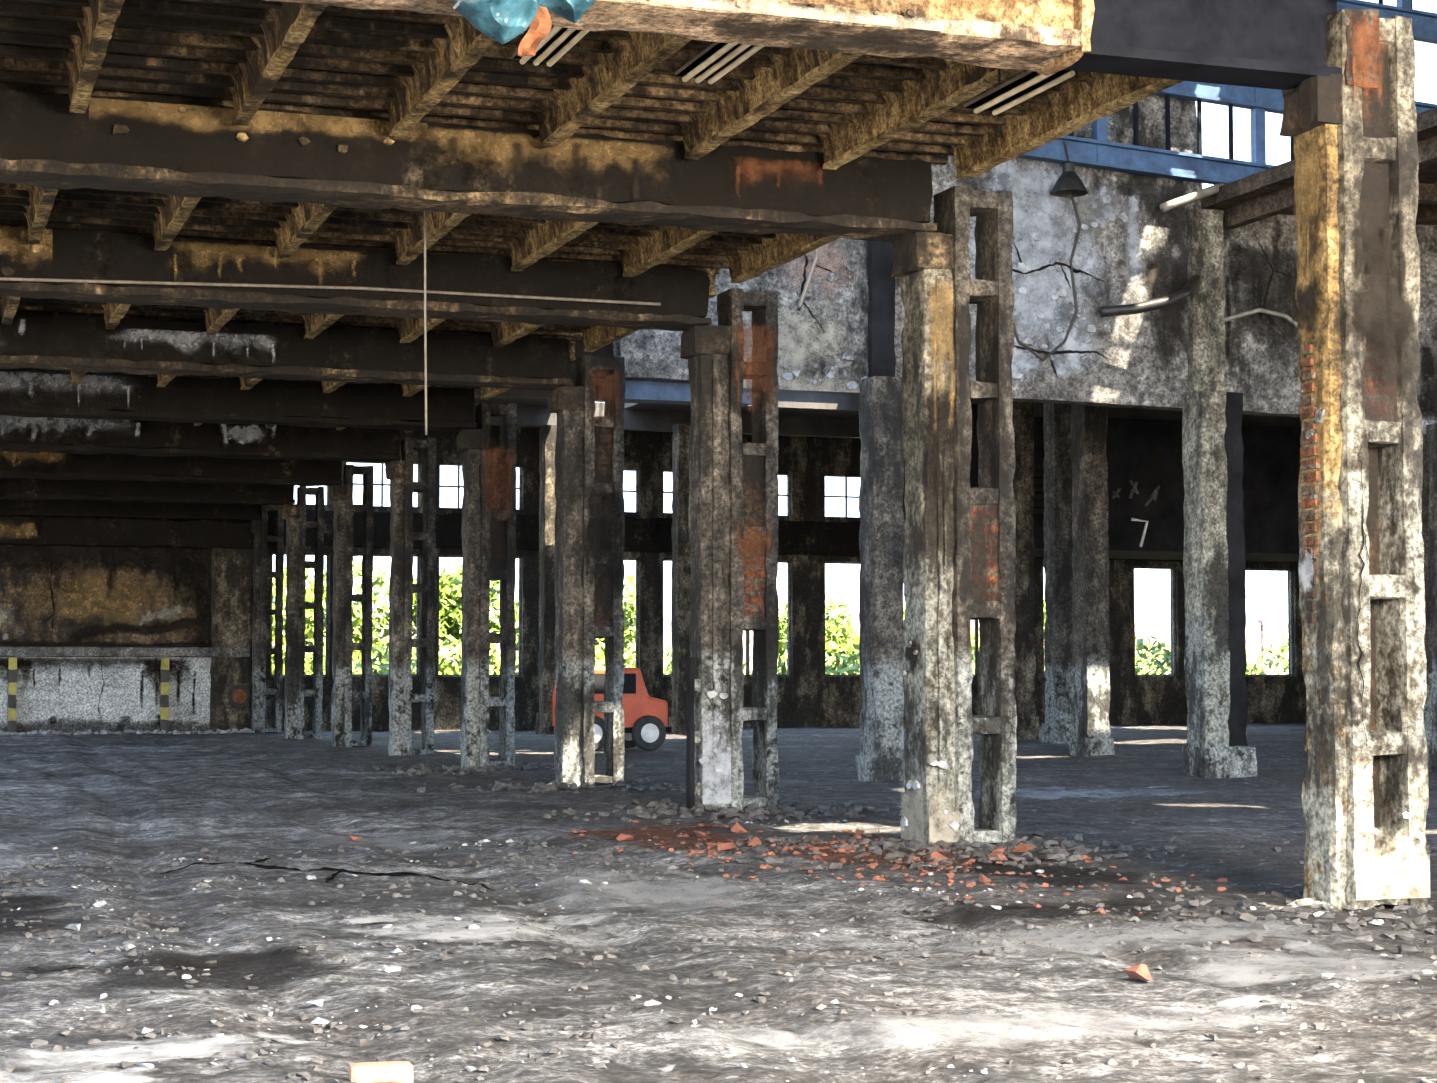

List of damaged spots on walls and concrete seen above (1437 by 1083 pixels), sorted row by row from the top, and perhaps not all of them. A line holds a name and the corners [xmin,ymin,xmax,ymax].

rust [1353,26,1382,96]
crack [1012,243,1105,288]
water stain [0,371,129,403]
water stain [124,329,275,357]
crack [1014,345,1111,379]
water stain [1420,347,1437,415]
water stain [0,415,118,463]
water stain [221,424,276,444]
water stain [0,523,37,537]
water stain [27,551,181,644]